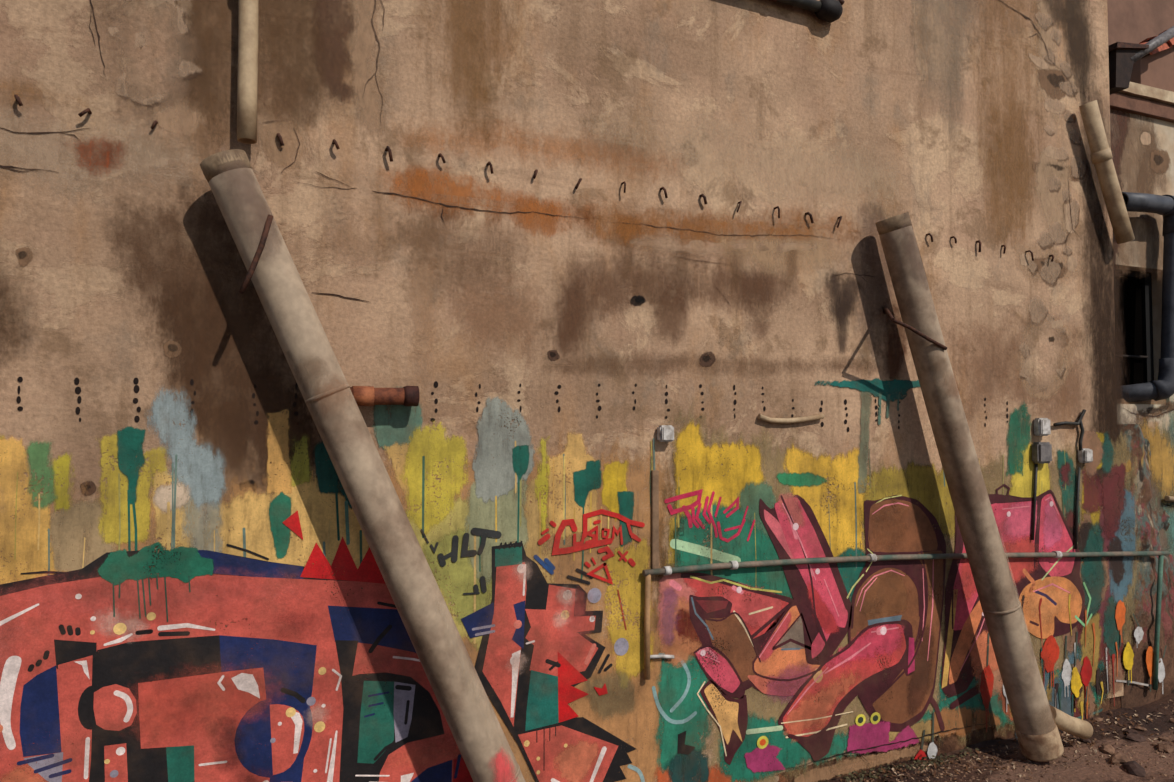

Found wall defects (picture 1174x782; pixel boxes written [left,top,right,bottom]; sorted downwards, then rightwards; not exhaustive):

damp [314,0,354,100]
crack [362,0,385,122]
damp [1047,0,1105,129]
crack [0,165,59,173]
crack [1,128,89,139]
crack [263,120,585,225]
rust [393,170,833,243]
peeling [1019,0,1082,282]
damp [116,187,327,479]
crack [312,292,369,302]
damp [838,295,848,350]
damp [1084,128,1123,461]